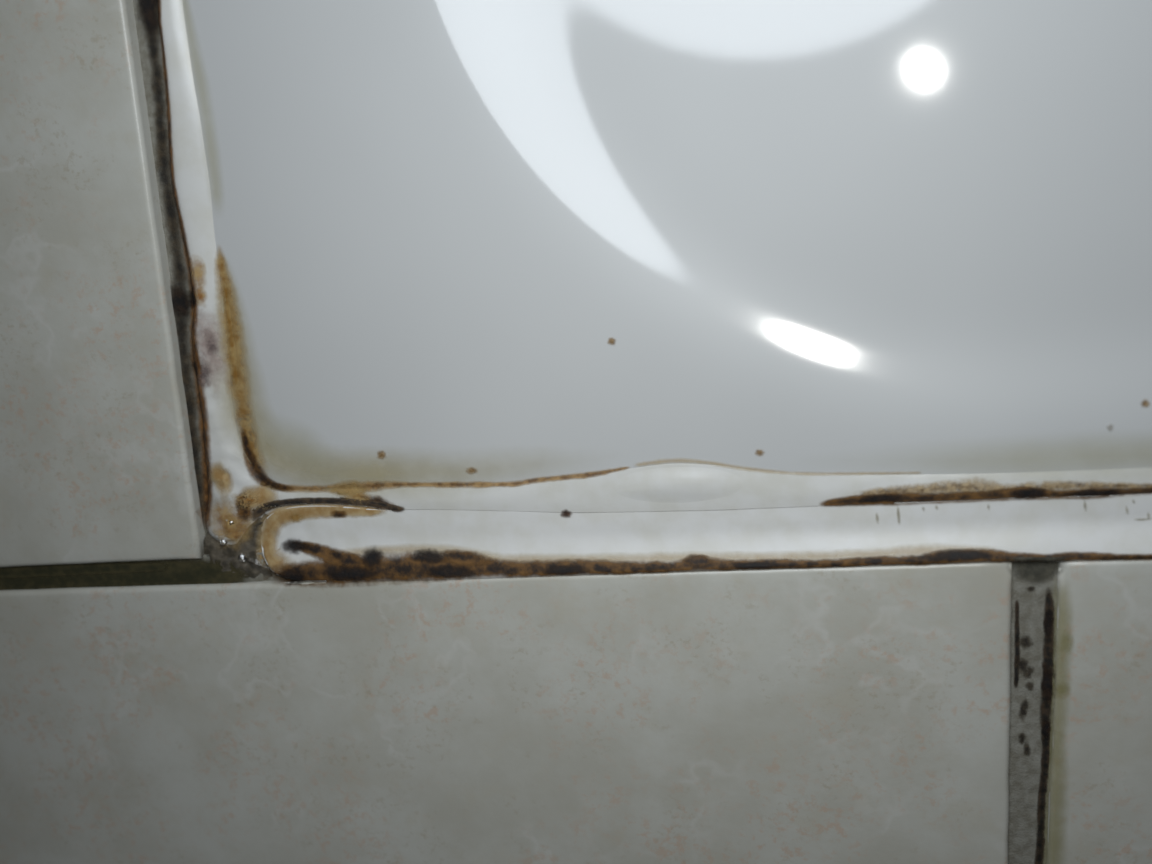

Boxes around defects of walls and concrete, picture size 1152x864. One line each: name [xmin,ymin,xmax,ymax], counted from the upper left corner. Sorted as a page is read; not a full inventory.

damp [139,0,222,527]
damp [273,540,1152,585]
damp [822,487,1152,506]
damp [1014,587,1055,864]